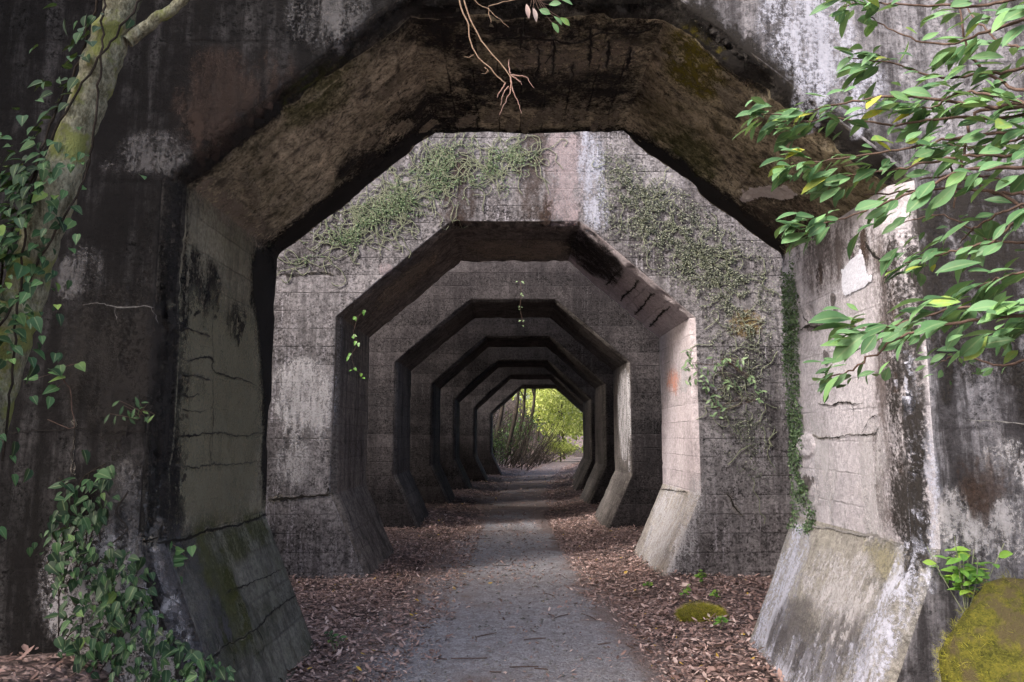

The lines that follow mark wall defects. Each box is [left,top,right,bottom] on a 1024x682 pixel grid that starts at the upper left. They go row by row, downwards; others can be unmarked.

crack [605,268,669,327]
peeling [830,249,872,311]
damp [47,0,785,682]
crack [8,312,265,480]
crack [812,401,878,440]
damp [752,171,1024,682]
crack [143,487,334,556]
crack [195,595,296,671]